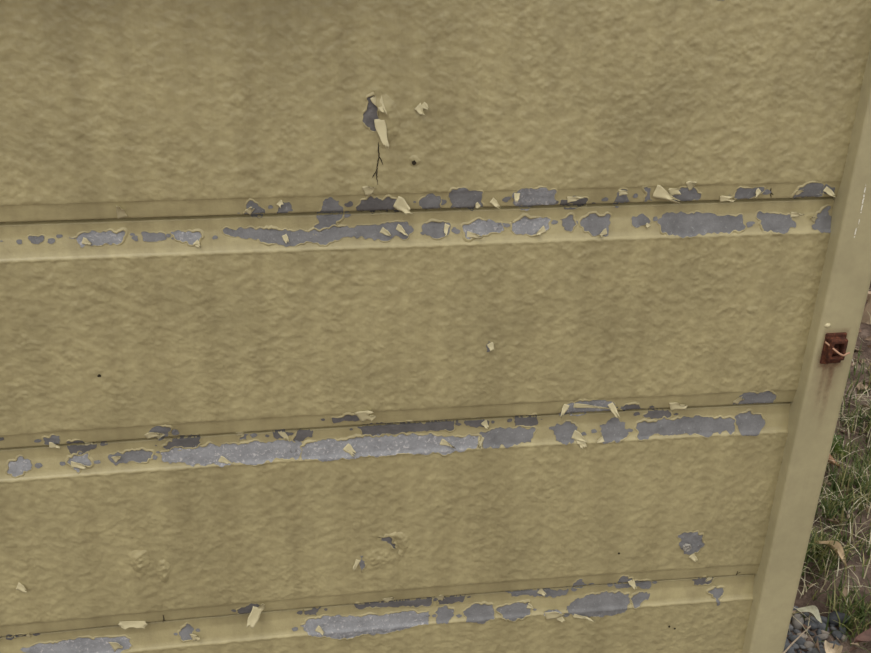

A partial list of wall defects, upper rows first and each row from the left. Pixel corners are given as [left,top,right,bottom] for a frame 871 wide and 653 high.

peeling [361,92,389,149]
peeling [16,181,836,248]
peeling [34,389,778,474]
peeling [5,455,43,479]
peeling [677,530,706,563]
peeling [691,575,725,606]
peeling [231,603,265,628]
peeling [292,575,657,641]
peeling [0,621,147,653]